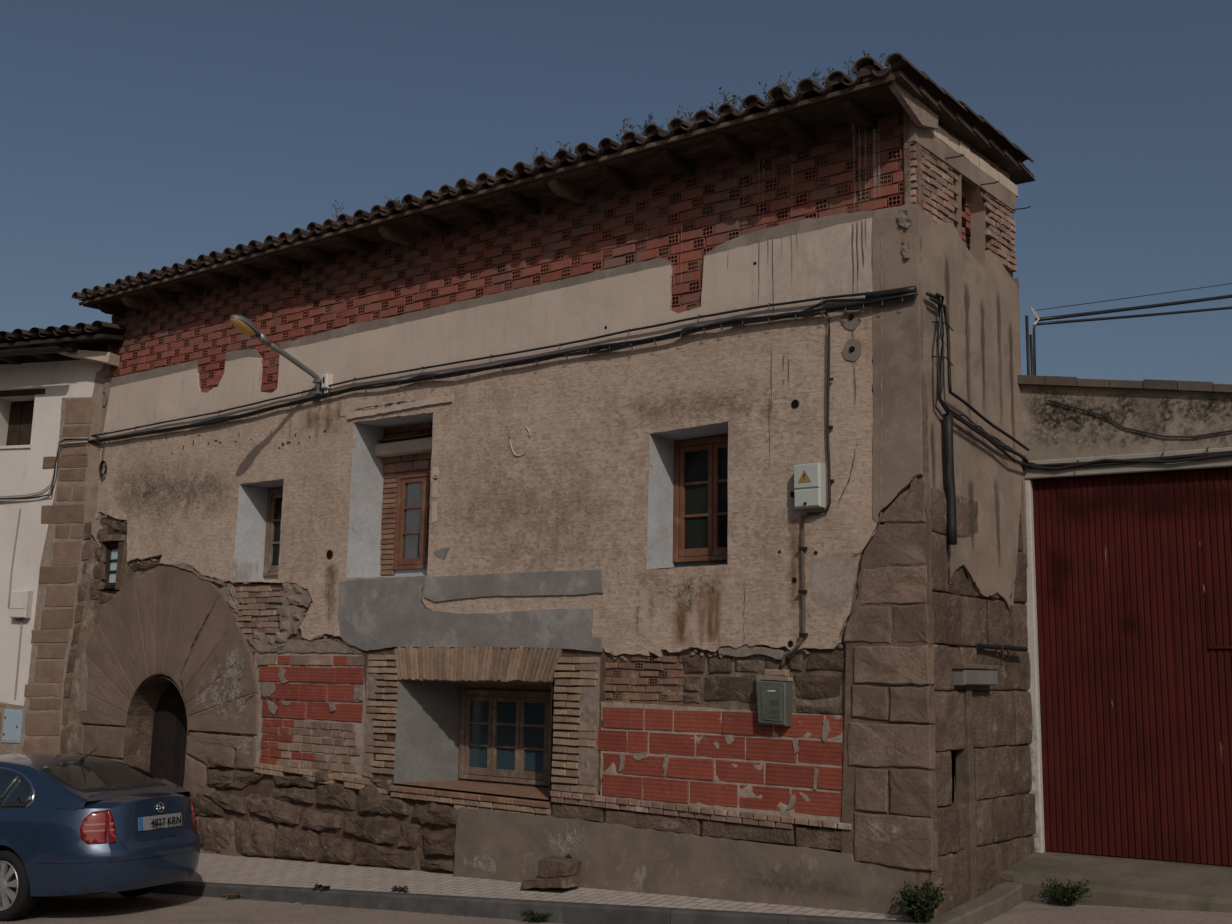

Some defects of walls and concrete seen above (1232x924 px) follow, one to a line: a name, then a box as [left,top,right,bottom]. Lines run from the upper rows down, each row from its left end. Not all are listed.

water stain [852,222,866,286]
spalling [603,627,846,715]